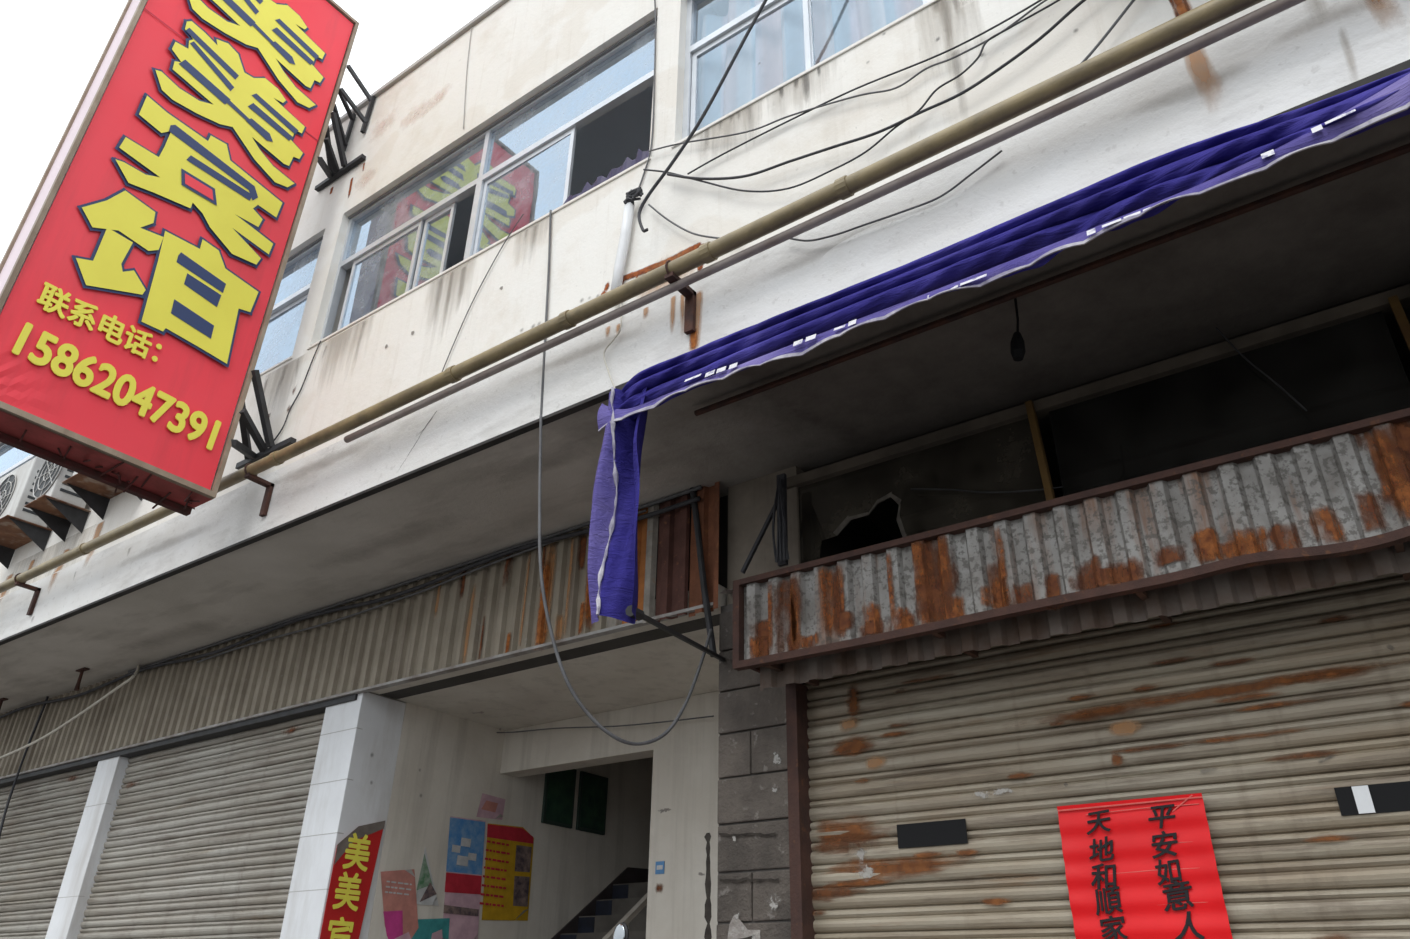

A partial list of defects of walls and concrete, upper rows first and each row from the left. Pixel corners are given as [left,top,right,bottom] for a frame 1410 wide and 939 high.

rust [1169,0,1190,17]
rust [601,242,703,295]
rust [671,292,702,348]
rust [1356,421,1410,531]
rust [503,535,591,653]
rust [750,536,964,658]
rust [981,530,1060,610]
rust [1077,555,1143,590]
rust [1156,507,1344,566]
rust [834,686,907,783]
rust [1051,667,1365,765]
rust [812,821,977,915]